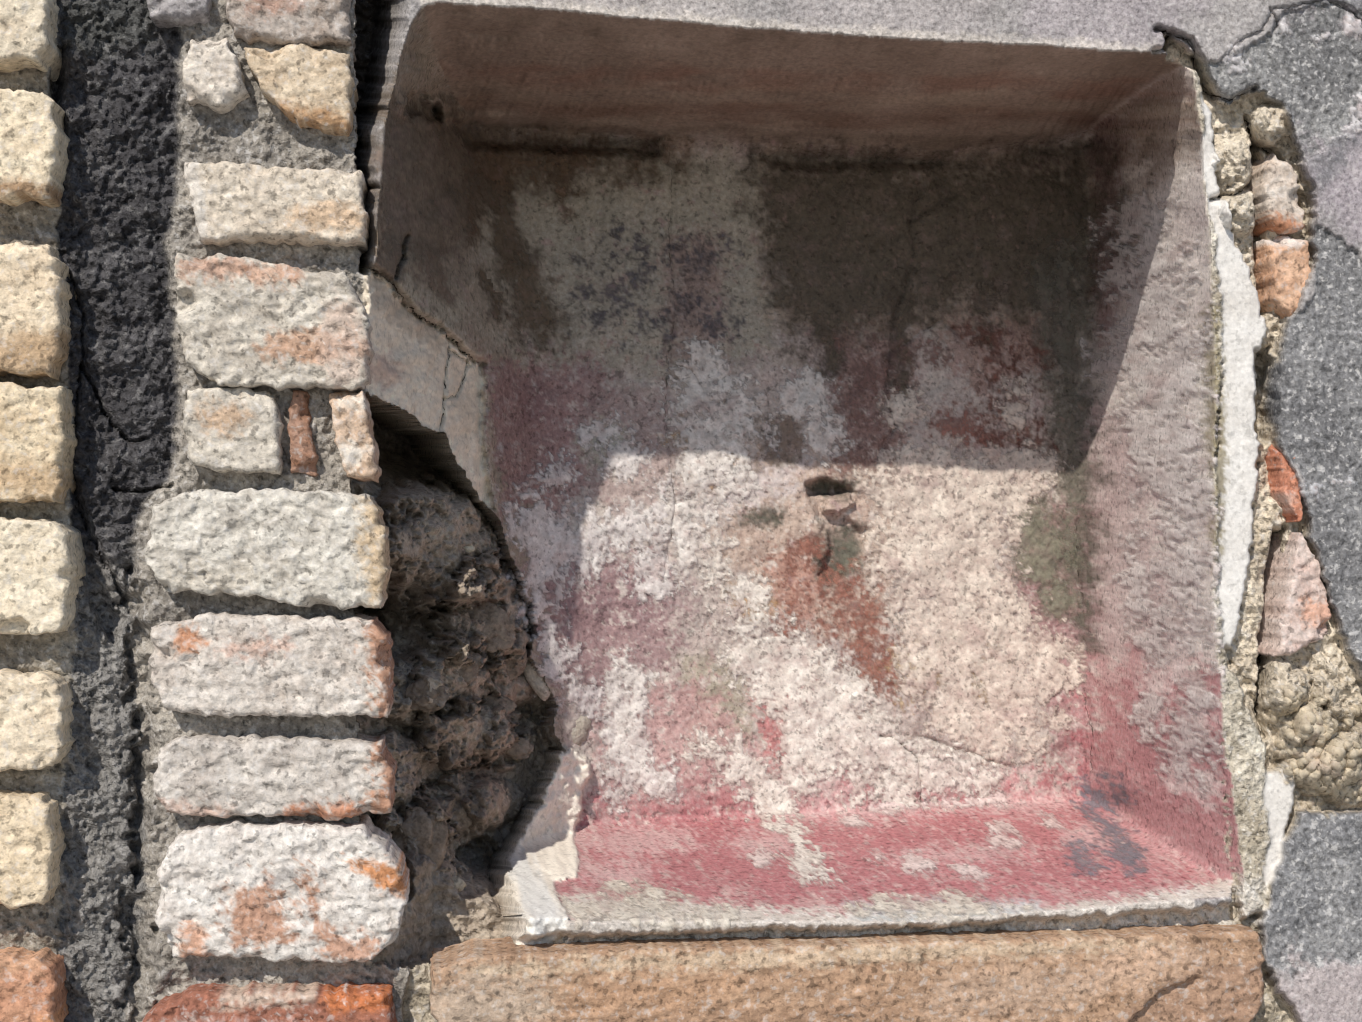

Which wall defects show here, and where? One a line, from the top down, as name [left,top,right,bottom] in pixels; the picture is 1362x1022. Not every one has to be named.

crack [361,254,479,424]
leakage [360,94,745,351]
spalling [351,266,1089,969]
spalling [1080,2,1362,980]